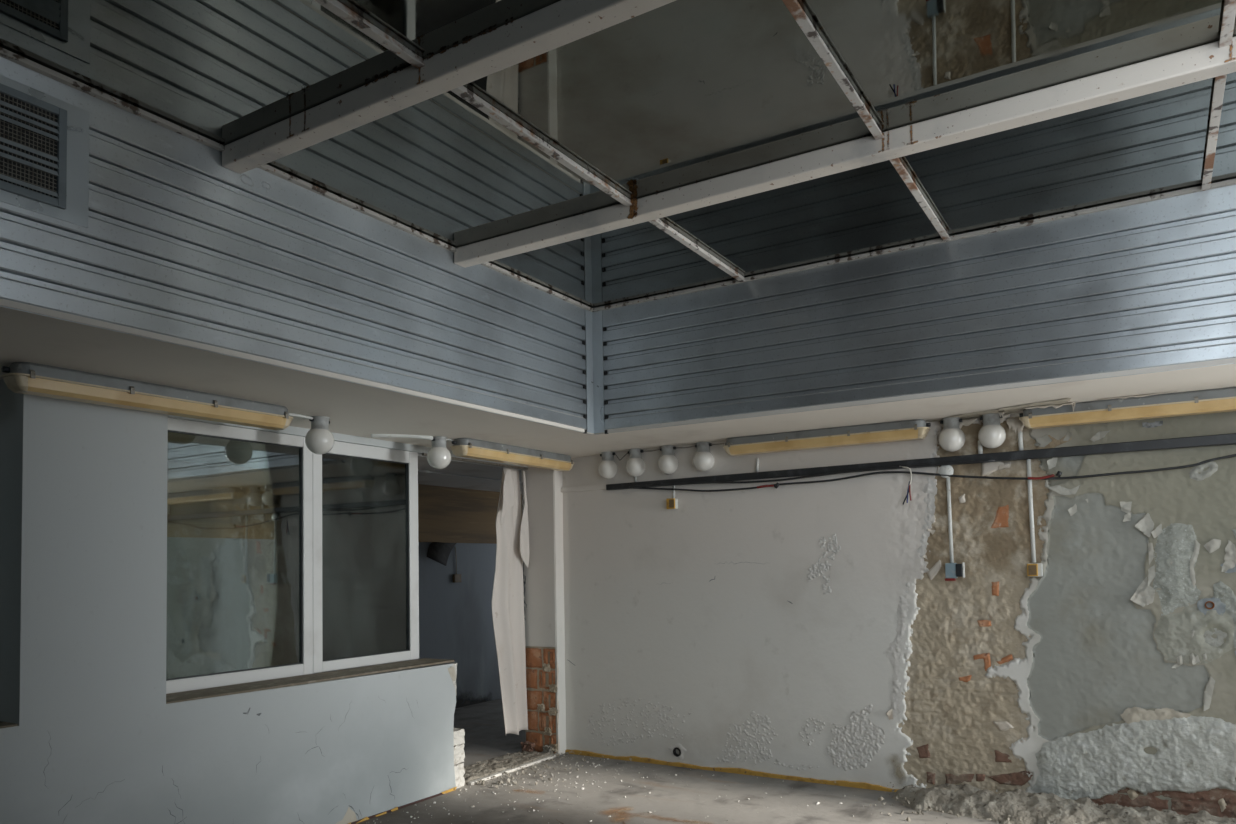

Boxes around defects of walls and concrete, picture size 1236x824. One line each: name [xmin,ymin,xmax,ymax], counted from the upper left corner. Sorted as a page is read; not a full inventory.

flaking render [520,646,558,754]
flaking render [886,398,1236,818]